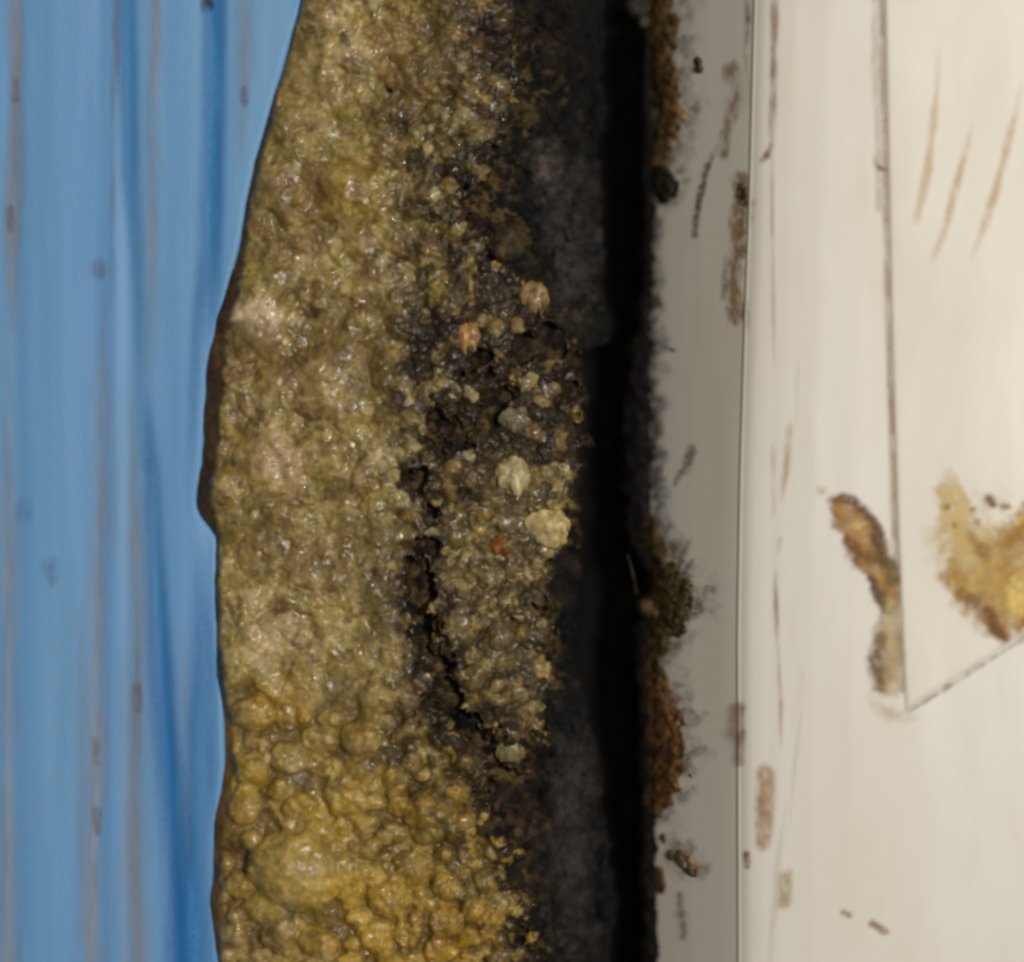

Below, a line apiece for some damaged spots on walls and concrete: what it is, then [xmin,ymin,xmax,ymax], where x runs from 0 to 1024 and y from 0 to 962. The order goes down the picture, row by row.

leakage [618,3,694,962]
rust [831,495,901,693]